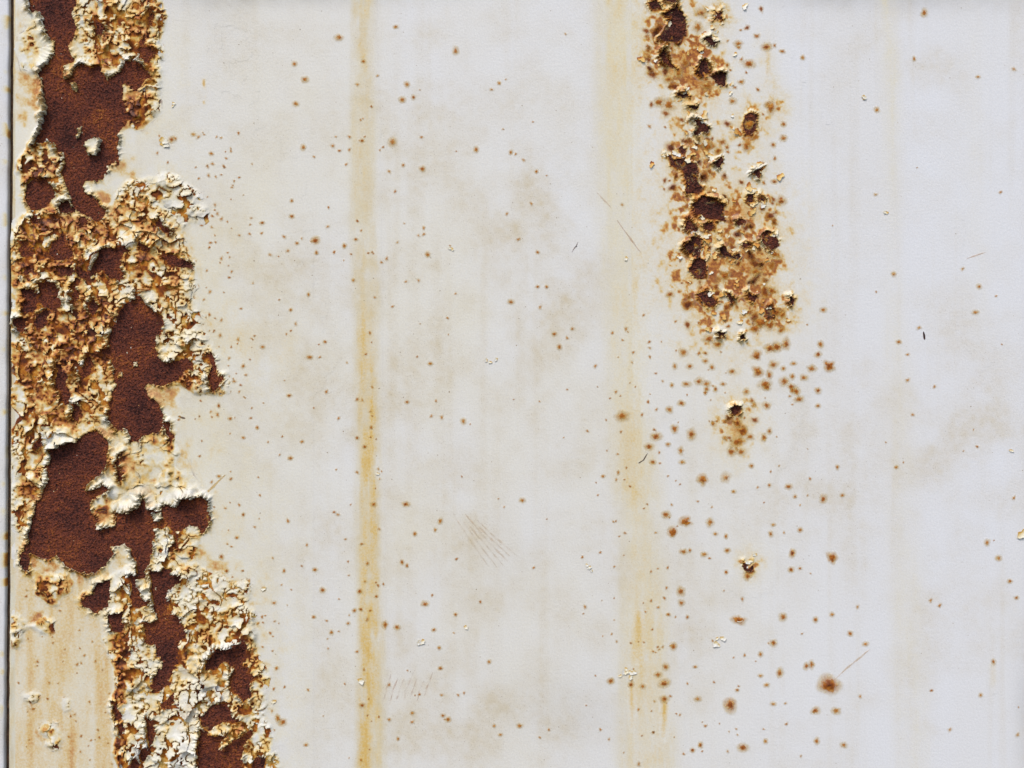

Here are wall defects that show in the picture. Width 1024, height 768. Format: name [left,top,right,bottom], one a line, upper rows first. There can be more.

peeling [14,5,55,84]
peeling [68,0,176,132]
spalling [637,0,801,349]
peeling [10,135,234,541]
corrosion [10,0,399,768]
corrosion [606,0,833,600]
peeling [10,561,68,651]
peeling [101,525,284,768]
corrosion [630,587,688,670]
corrosion [638,665,680,743]
spalling [738,553,759,578]
corrosion [820,678,838,693]